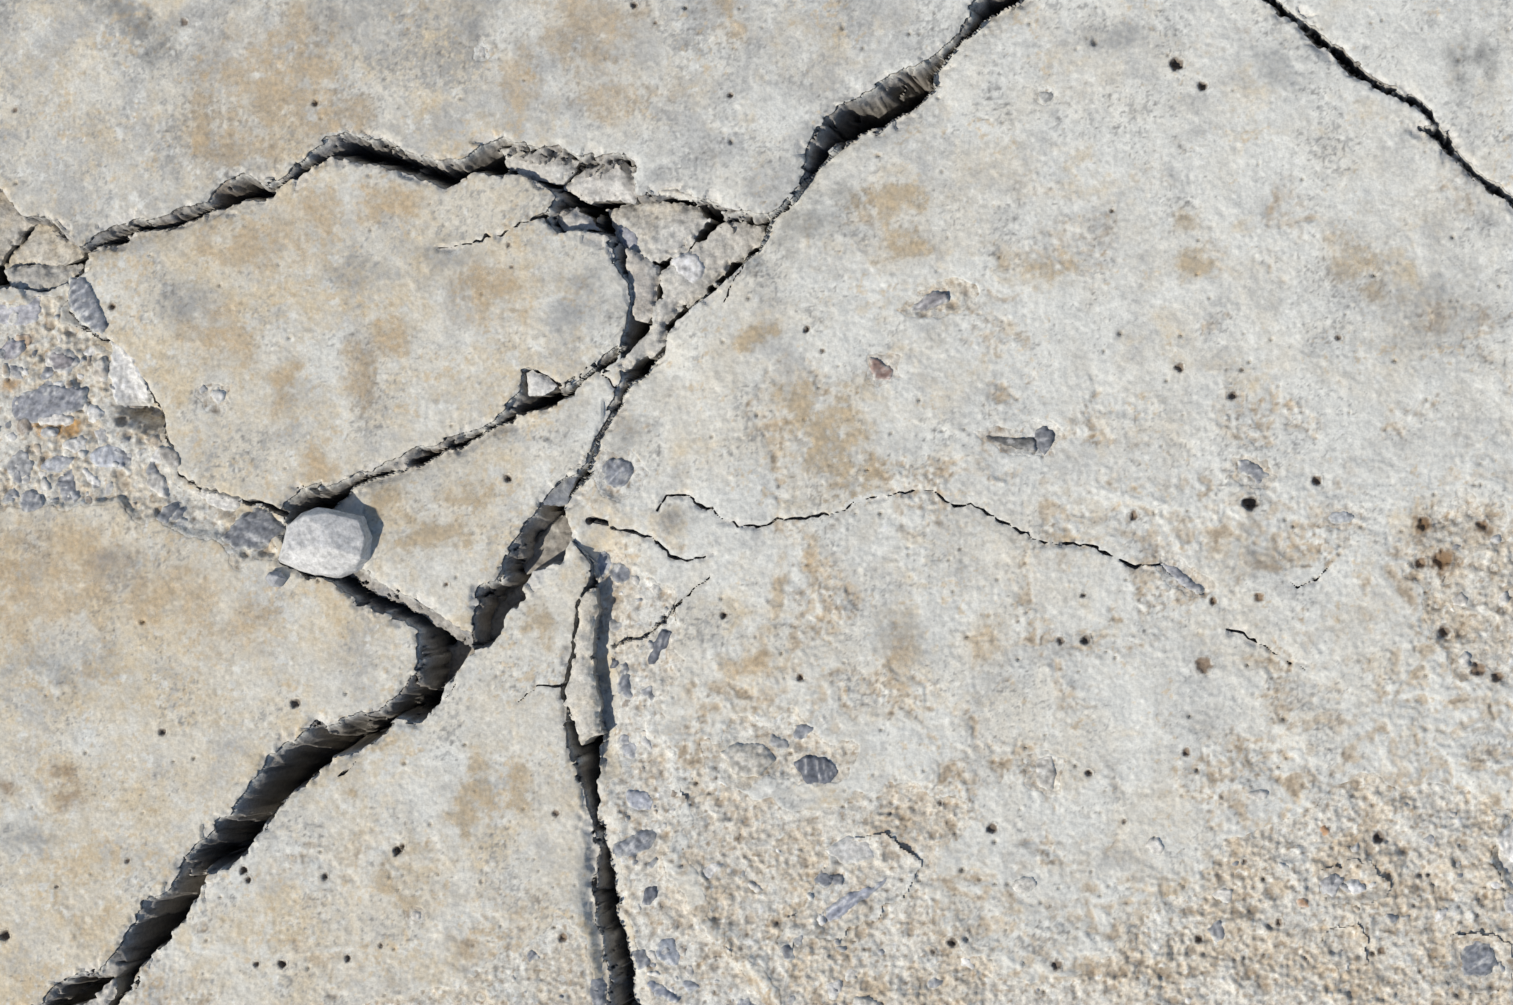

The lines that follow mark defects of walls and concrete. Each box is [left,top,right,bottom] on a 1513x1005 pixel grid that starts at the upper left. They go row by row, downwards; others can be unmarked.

crack [1262,0,1513,209]
spalling [0,276,286,571]
crack [0,0,1162,1005]
crack [1226,628,1305,670]